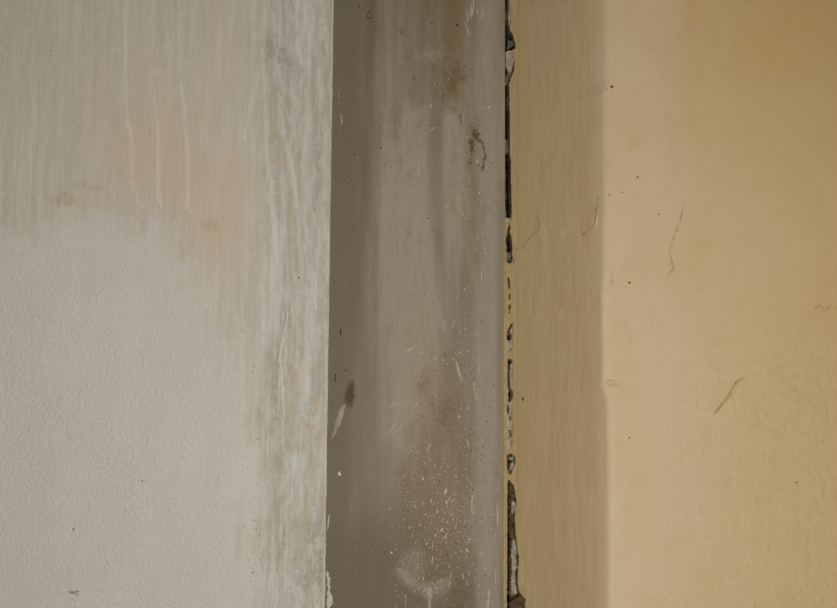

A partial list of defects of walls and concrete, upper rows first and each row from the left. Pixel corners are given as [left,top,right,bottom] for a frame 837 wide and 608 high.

leakage [41,0,303,283]
crack [667,202,685,278]
flaking render [508,594,526,608]